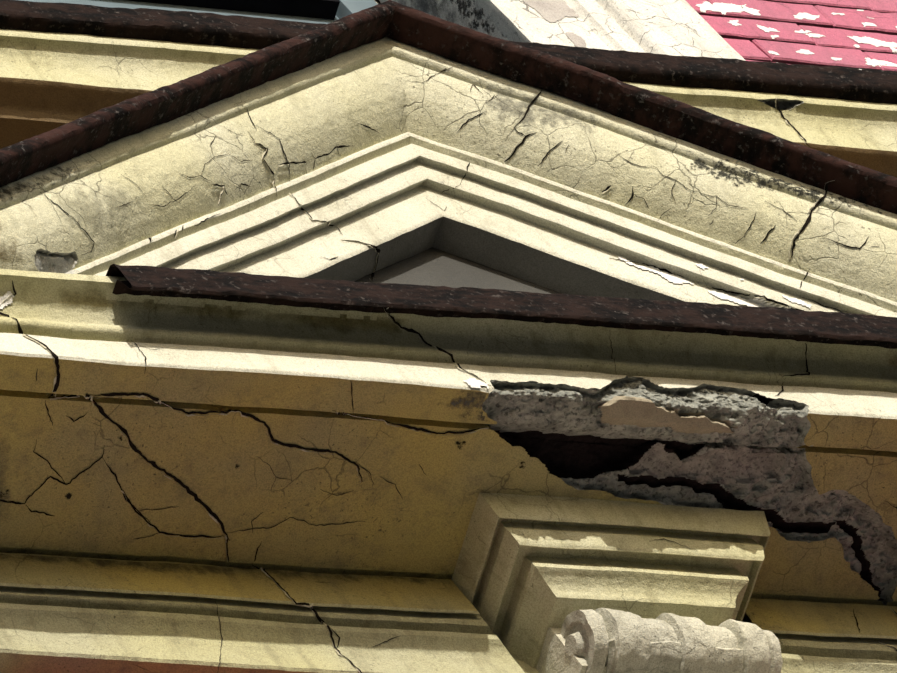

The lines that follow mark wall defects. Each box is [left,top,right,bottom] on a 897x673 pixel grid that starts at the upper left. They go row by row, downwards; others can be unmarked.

damp [411,0,503,35]
peeling [696,1,780,39]
peeling [793,12,823,38]
peeling [847,9,897,70]
crack [502,89,569,166]
crack [775,98,810,147]
crack [119,109,381,279]
peeling [34,249,78,274]
crack [602,155,848,313]
crack [827,236,879,249]
crack [0,281,403,673]
spalling [464,376,897,606]